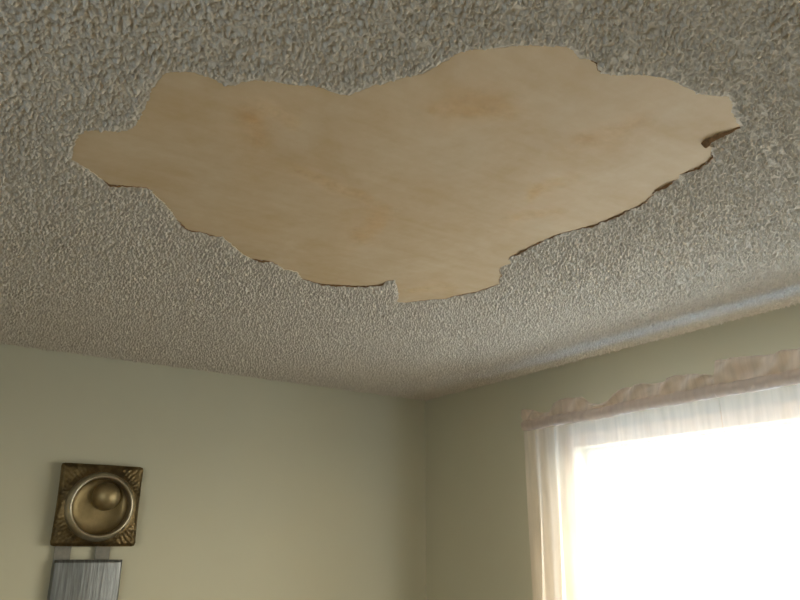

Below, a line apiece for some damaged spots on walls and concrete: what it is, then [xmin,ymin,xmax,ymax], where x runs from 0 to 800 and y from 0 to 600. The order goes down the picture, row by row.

peeling [71,44,740,303]